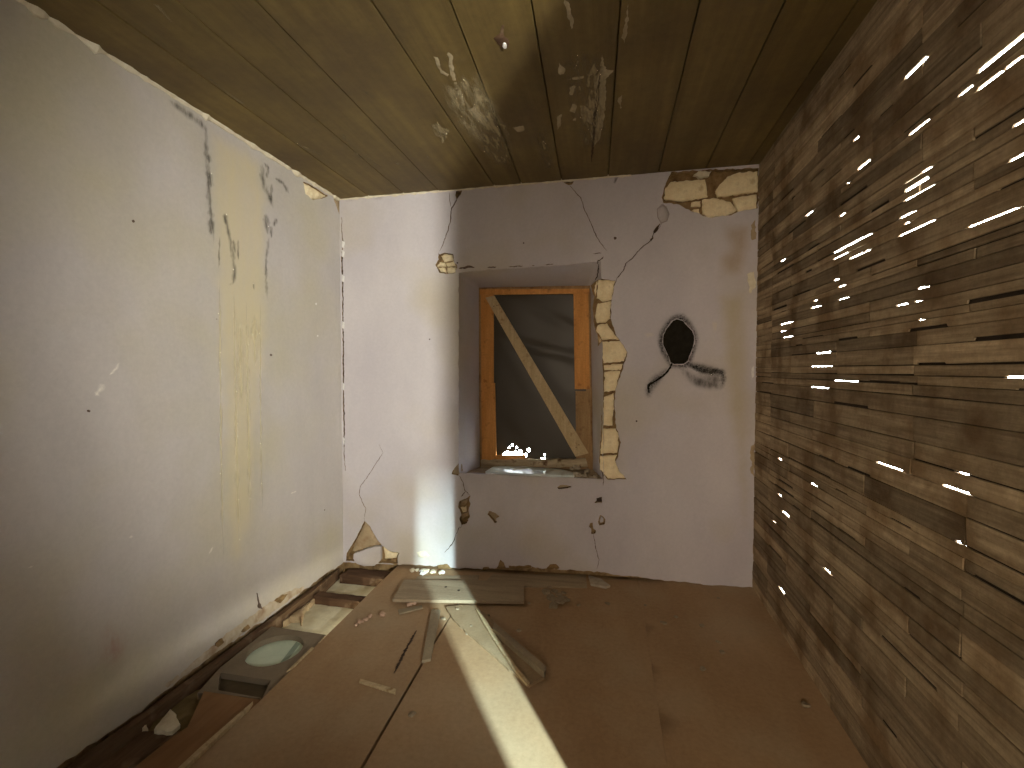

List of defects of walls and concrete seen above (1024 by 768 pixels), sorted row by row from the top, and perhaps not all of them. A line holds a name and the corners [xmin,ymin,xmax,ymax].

peeling [434,52,525,162]
peeling [557,57,622,145]
crack [567,183,660,285]
flaking render [662,170,758,240]
damp [176,105,275,579]
flaking render [591,280,627,479]
spalling [348,522,399,566]
spalling [459,495,471,523]